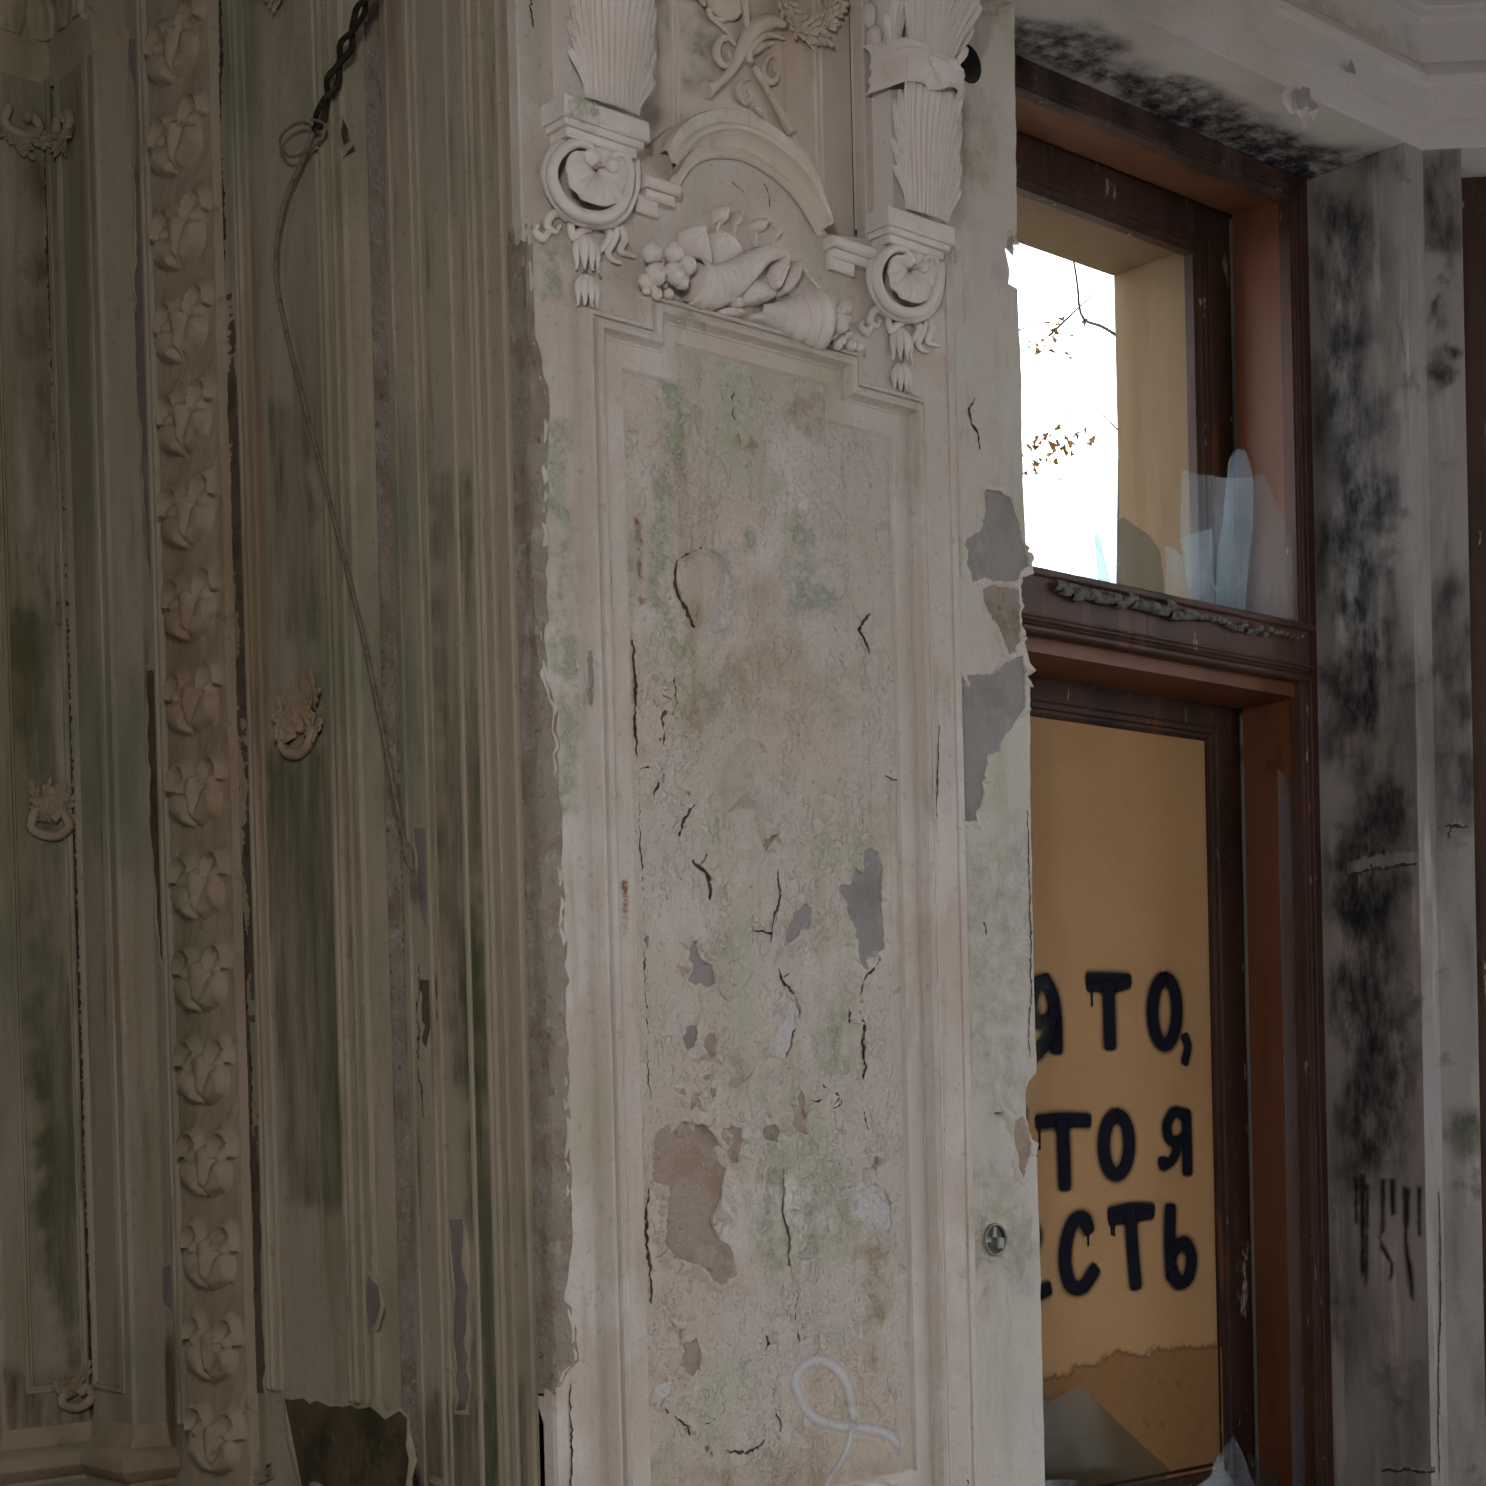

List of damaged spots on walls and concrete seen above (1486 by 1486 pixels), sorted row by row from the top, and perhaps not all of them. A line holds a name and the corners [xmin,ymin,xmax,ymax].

crack [857,613,886,654]
flaking render [958,477,1037,831]
flaking render [226,281,417,1486]
flaking render [643,924,822,1296]
crack [631,640,888,1305]
flaking render [772,891,817,966]
flaking render [834,840,892,972]
crack [665,1385,803,1486]